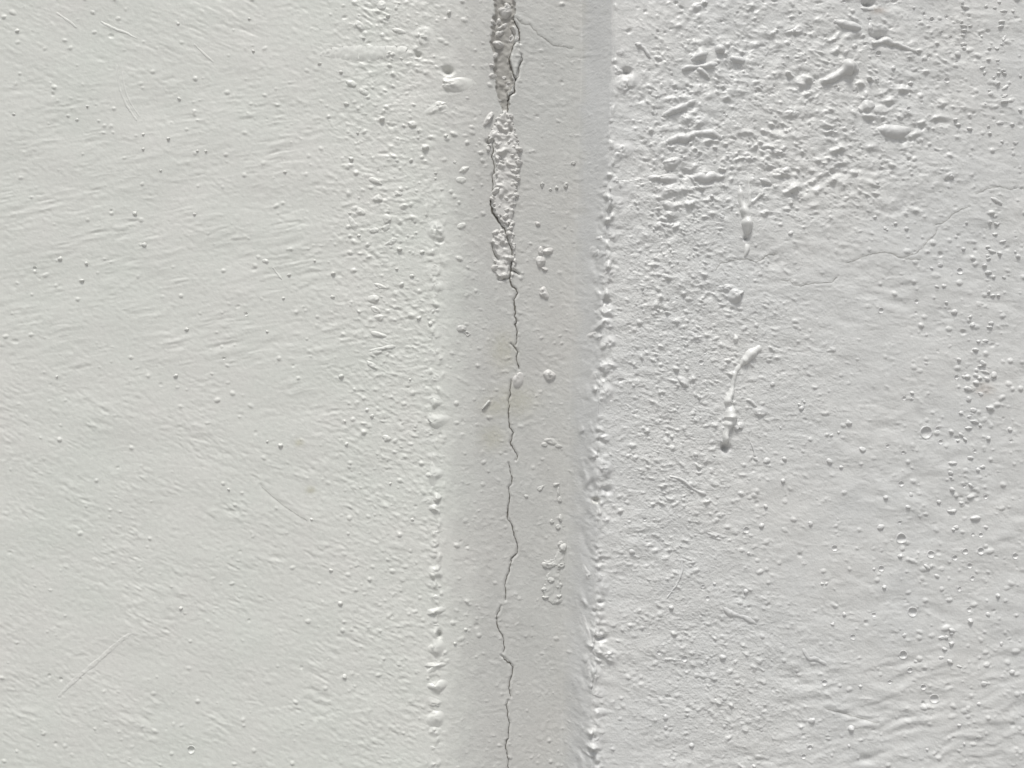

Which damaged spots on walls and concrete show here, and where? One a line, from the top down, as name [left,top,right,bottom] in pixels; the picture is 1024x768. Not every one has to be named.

crack [490,143,519,768]